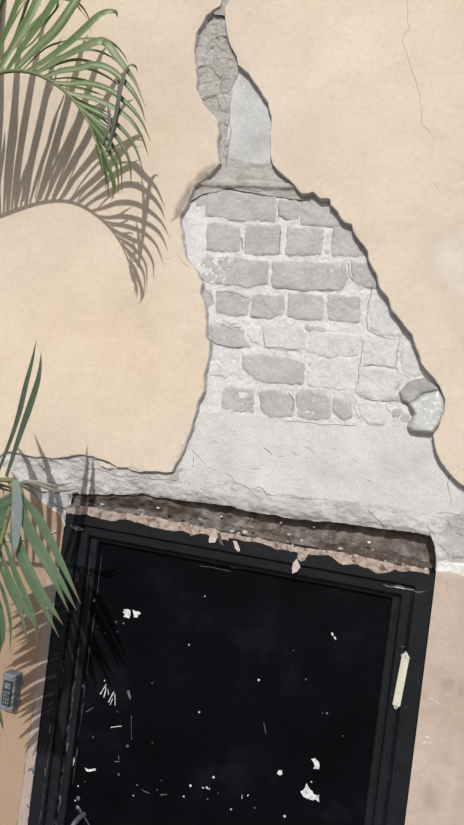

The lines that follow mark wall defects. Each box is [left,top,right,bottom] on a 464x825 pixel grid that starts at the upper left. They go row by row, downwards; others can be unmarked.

flaking render [0,0,464,576]